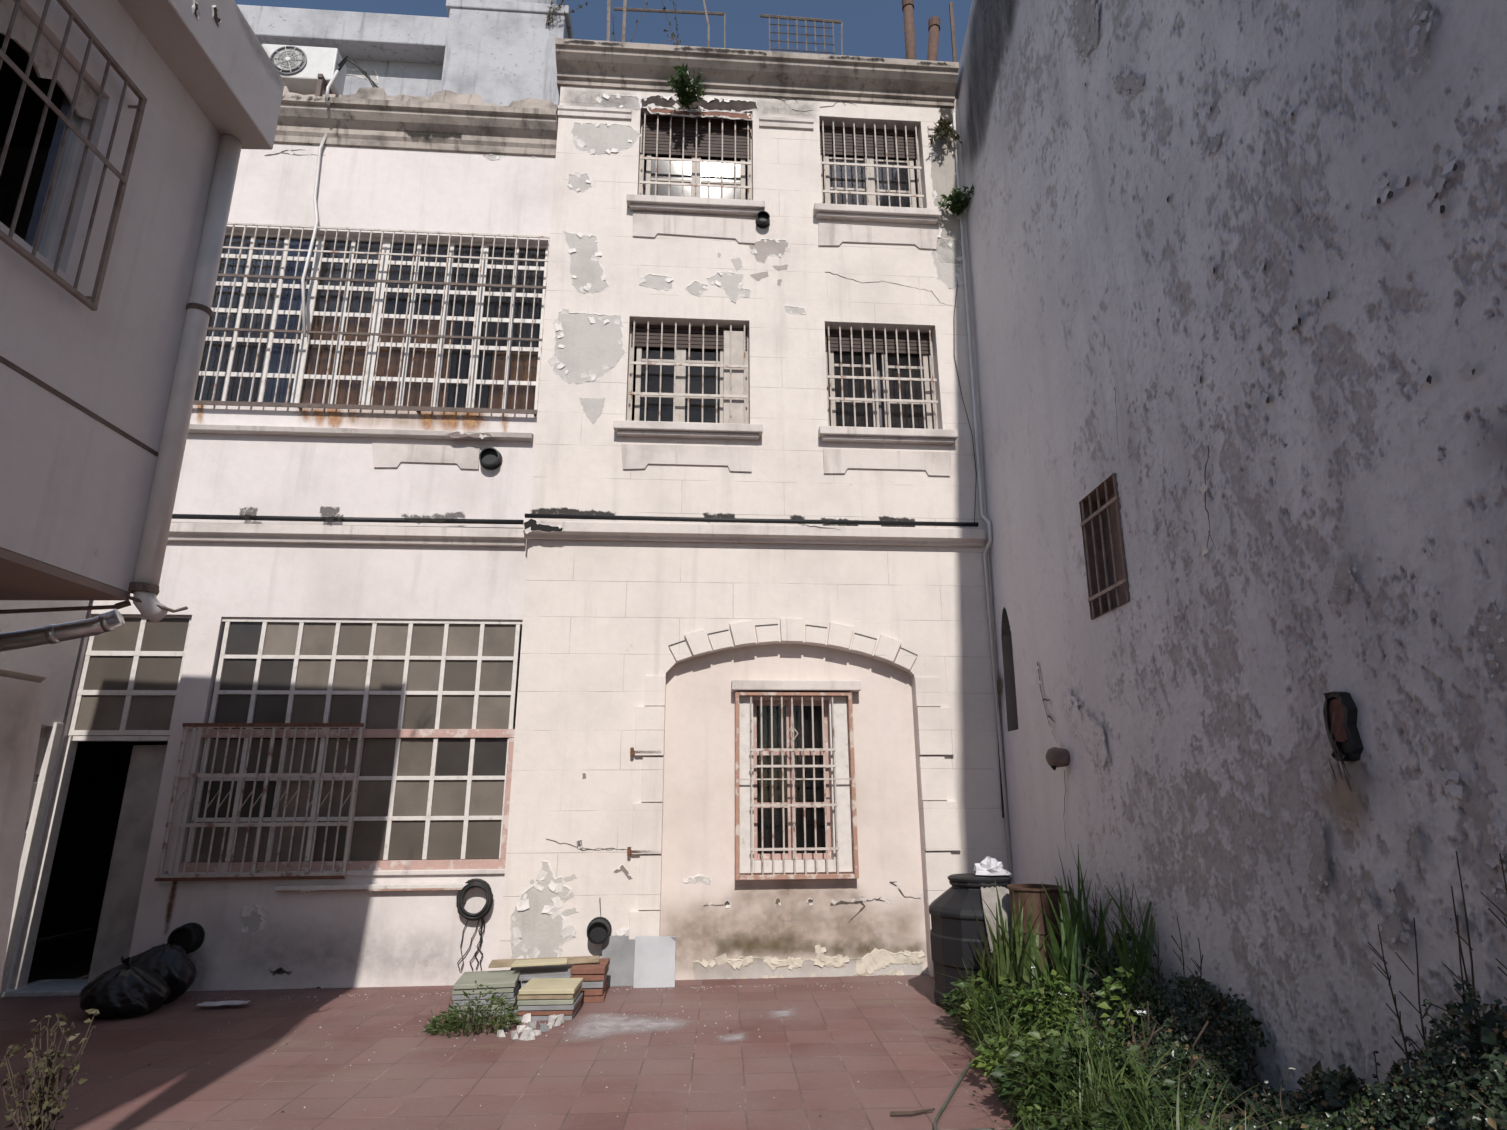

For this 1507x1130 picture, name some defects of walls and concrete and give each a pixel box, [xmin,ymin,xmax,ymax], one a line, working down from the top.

peeling [570,92,758,155]
peeling [568,172,593,192]
peeling [929,136,963,289]
flaking render [1371,159,1458,218]
peeling [562,231,609,294]
peeling [639,238,791,304]
peeling [548,308,625,424]
rust [303,408,340,426]
rust [400,412,481,428]
peeling [509,860,578,959]
leakage [676,914,816,950]
flaking render [691,945,925,980]